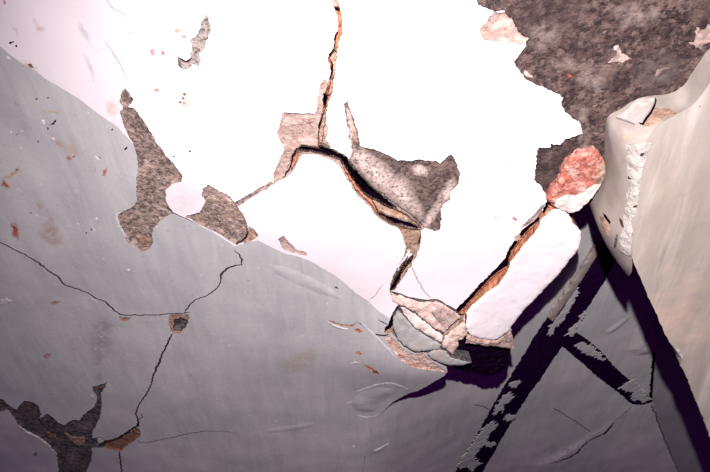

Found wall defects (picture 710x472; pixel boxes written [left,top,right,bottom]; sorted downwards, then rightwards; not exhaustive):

flaking render [115,89,258,251]
flaking render [175,14,211,70]
flaking render [273,79,331,183]
crack [282,0,431,336]
flaking render [343,101,460,231]
flaking render [476,0,710,193]
crack [0,242,243,322]
flaking render [278,236,307,256]
crack [456,201,552,315]
peeling [547,287,580,336]
flaking render [0,382,141,472]
crack [135,334,236,443]